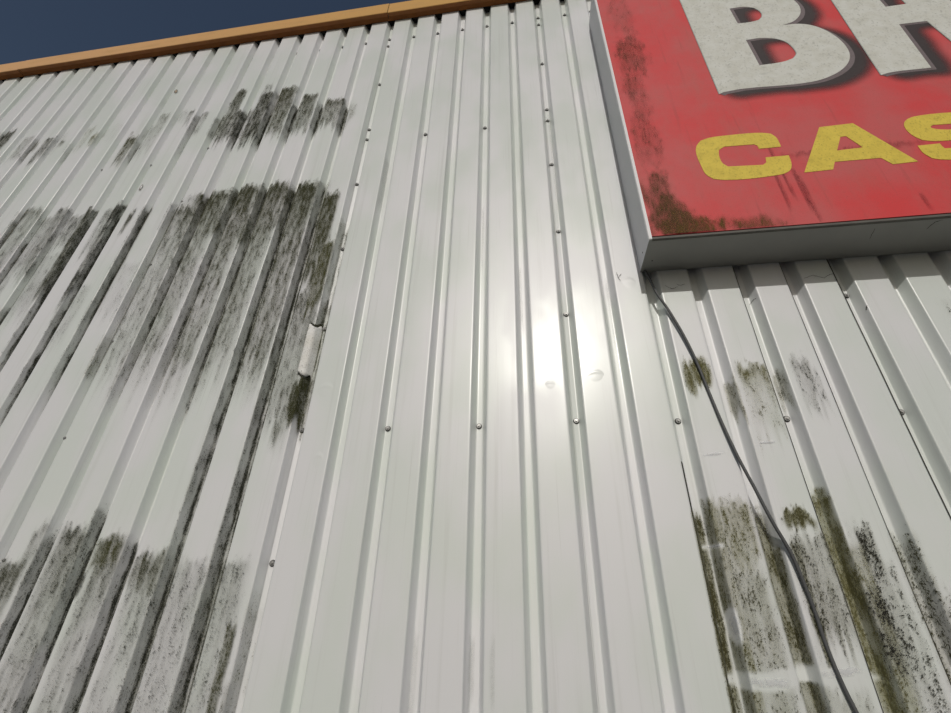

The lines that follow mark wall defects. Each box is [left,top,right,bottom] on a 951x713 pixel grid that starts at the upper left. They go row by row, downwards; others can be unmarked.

damp [642,166,788,234]
damp [683,356,712,393]
damp [725,358,825,445]
damp [692,488,951,713]